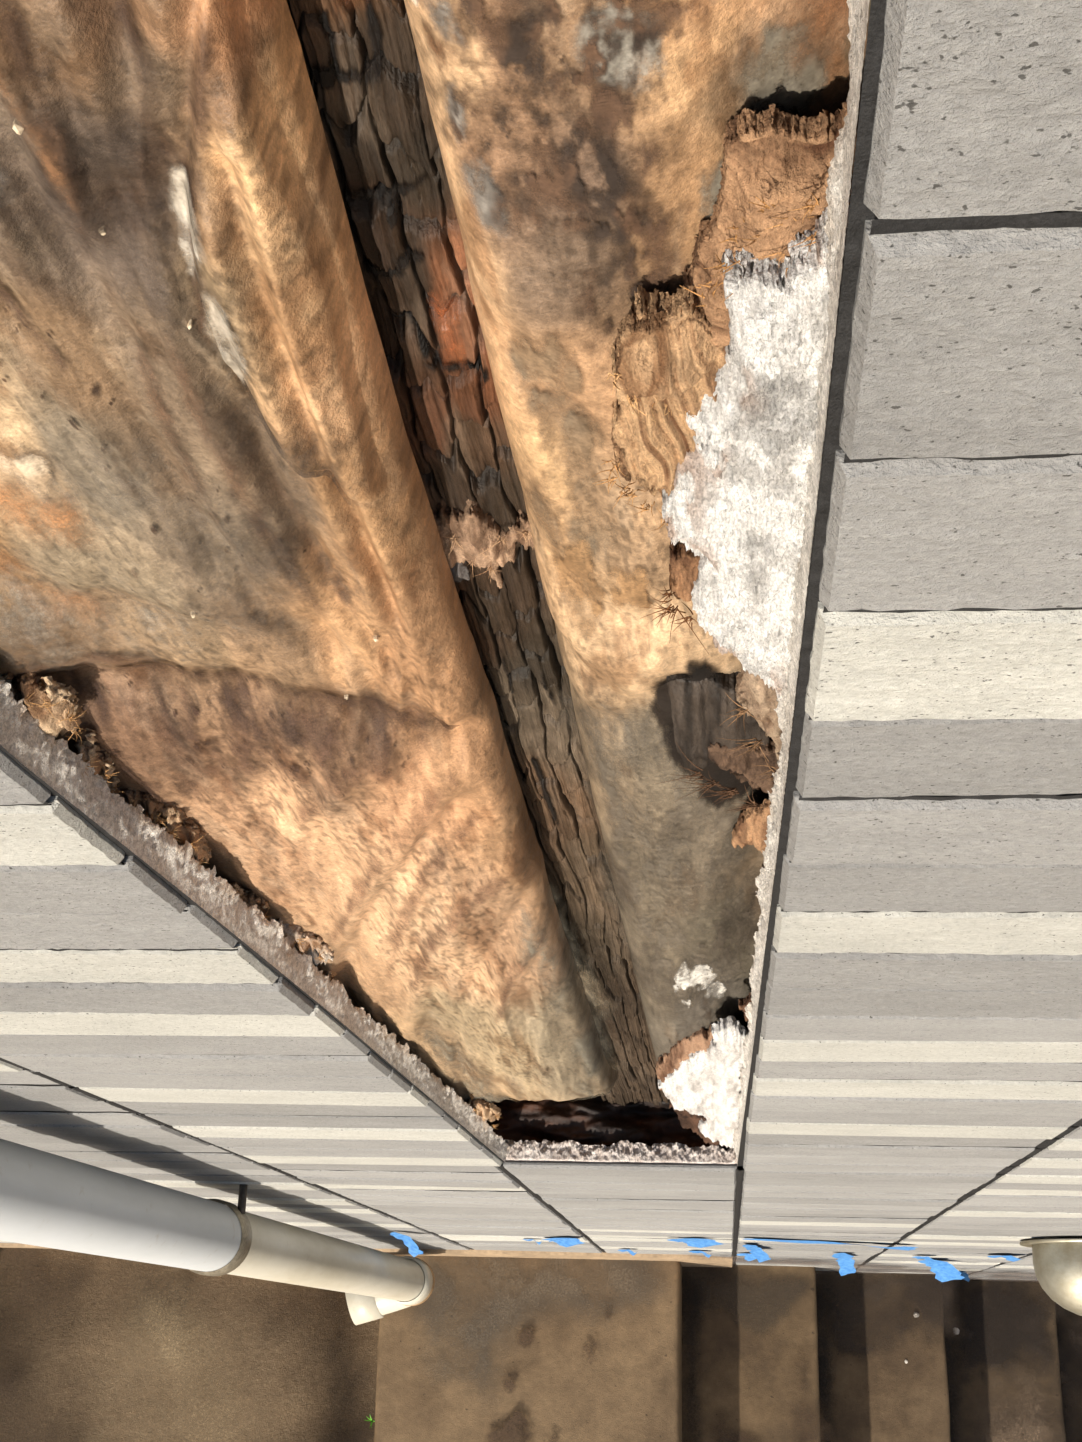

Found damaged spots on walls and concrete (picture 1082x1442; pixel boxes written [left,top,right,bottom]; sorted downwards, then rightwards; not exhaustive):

peeling [429,3,453,35]
peeling [577,2,660,89]
peeling [743,21,827,114]
peeling [462,160,508,235]
damp [428,0,688,335]
spalling [662,190,851,701]
damp [61,653,404,798]
spalling [655,1016,756,1150]